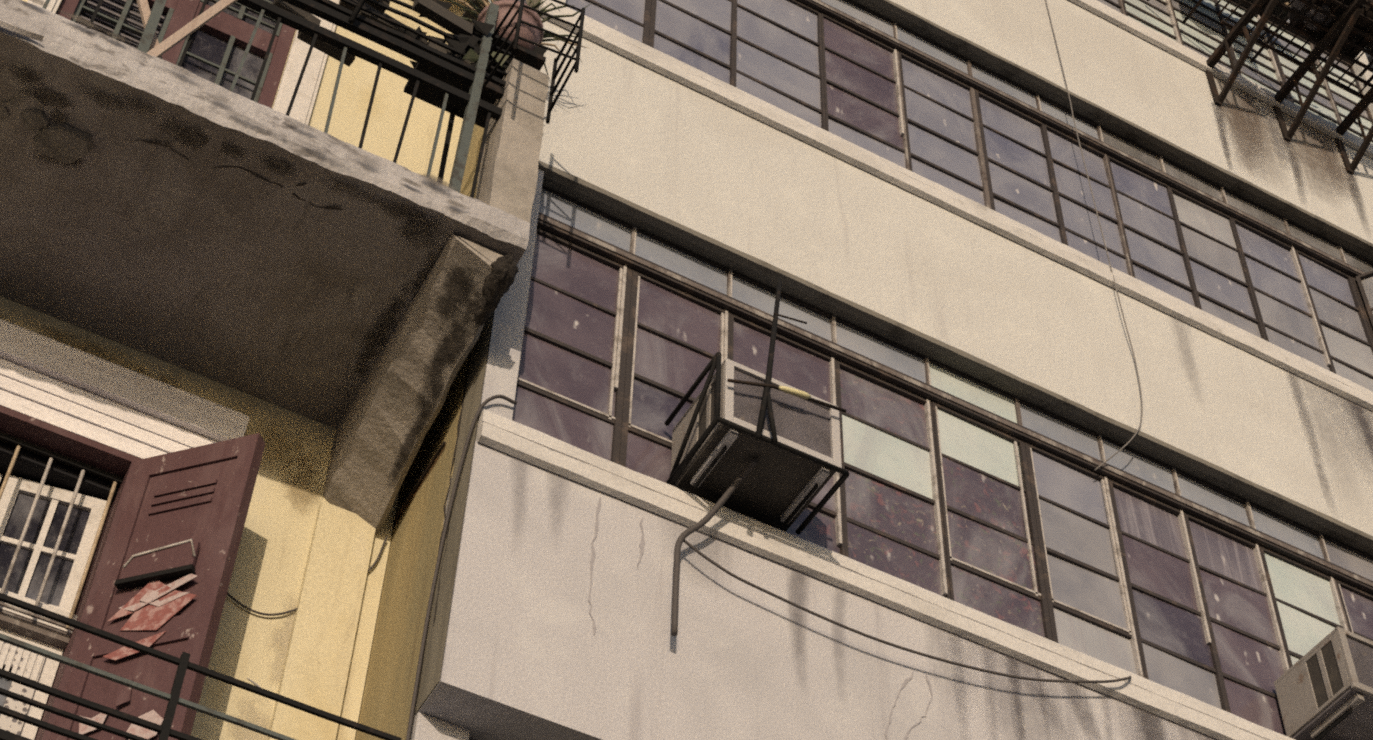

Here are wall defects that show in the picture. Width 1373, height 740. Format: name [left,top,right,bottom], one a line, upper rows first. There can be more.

leakage [1216,86,1268,156]
leakage [1281,111,1358,196]
leakage [357,249,441,374]
leakage [403,411,448,502]
crack [588,496,601,635]
crack [637,517,645,567]
crack [885,670,933,740]